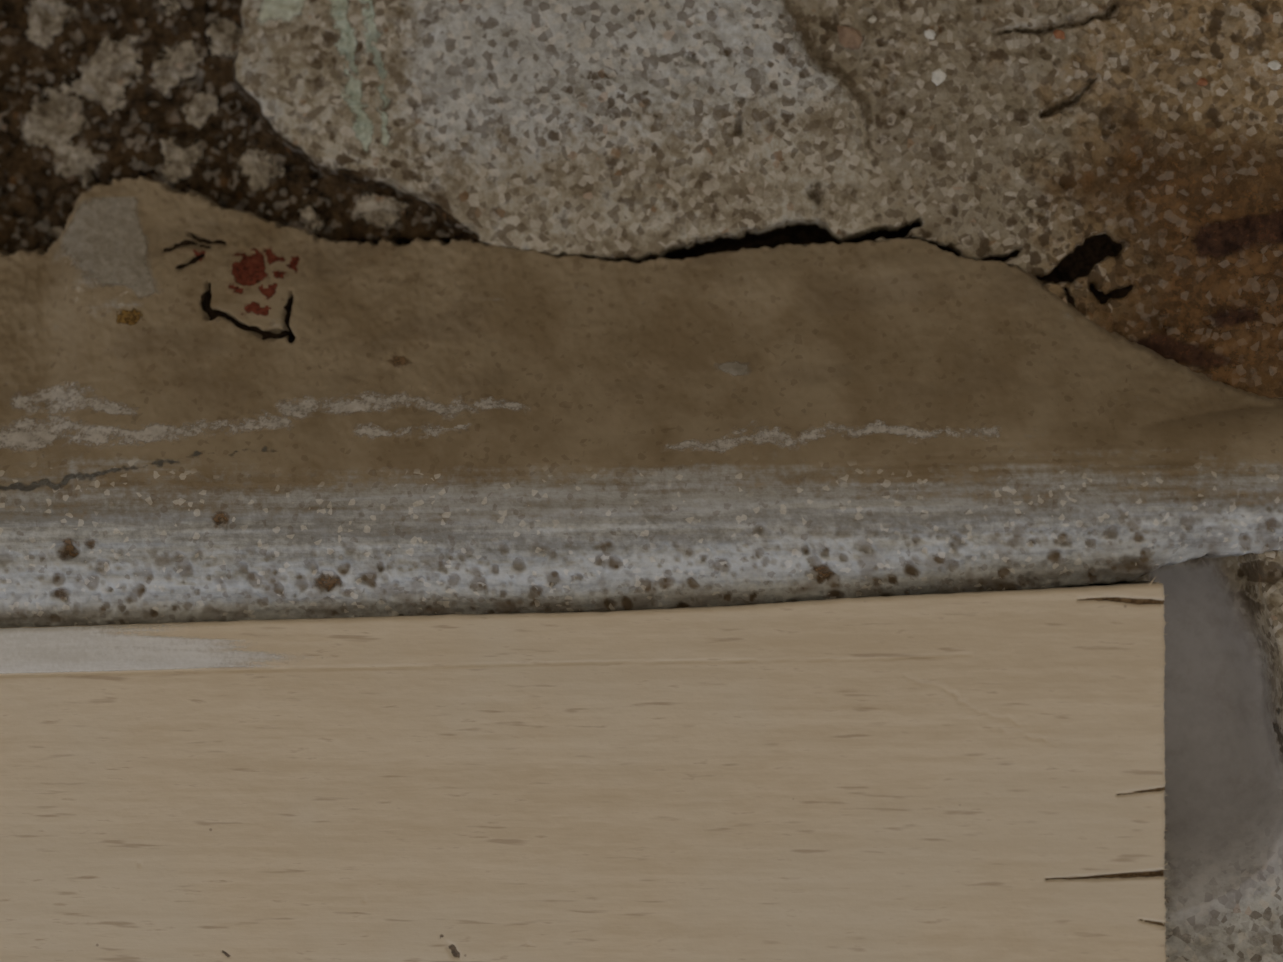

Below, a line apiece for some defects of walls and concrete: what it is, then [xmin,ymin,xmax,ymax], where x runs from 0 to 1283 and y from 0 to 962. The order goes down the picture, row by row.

spalling [0,0,479,254]
crack [372,238,411,246]
crack [619,223,1133,307]
rust [1062,125,1283,399]